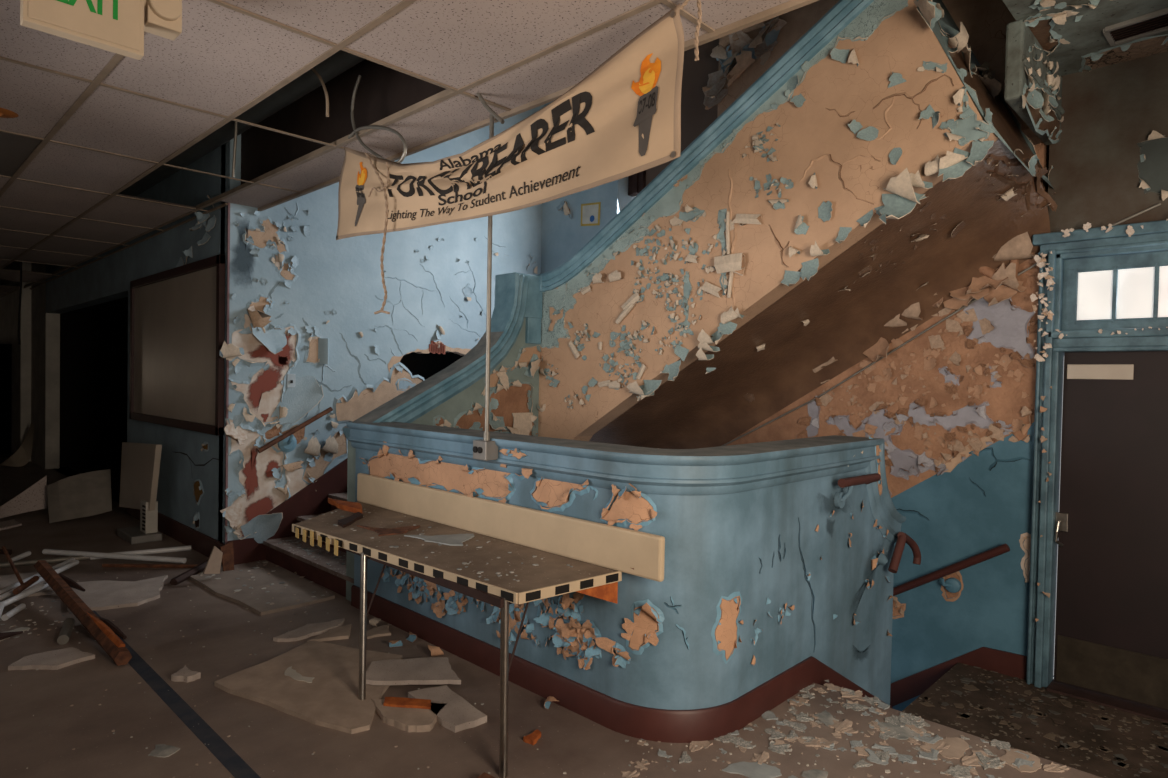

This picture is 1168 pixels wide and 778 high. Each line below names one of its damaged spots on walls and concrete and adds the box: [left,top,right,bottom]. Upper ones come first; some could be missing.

crack [800,74,954,205]
peeling [176,195,216,267]
peeling [1061,222,1143,237]
crack [304,263,495,419]
peeling [219,209,593,543]
peeling [796,232,1067,496]
peeling [600,483,657,531]
crack [759,519,815,650]
peeling [865,519,906,636]
peeling [941,571,964,602]